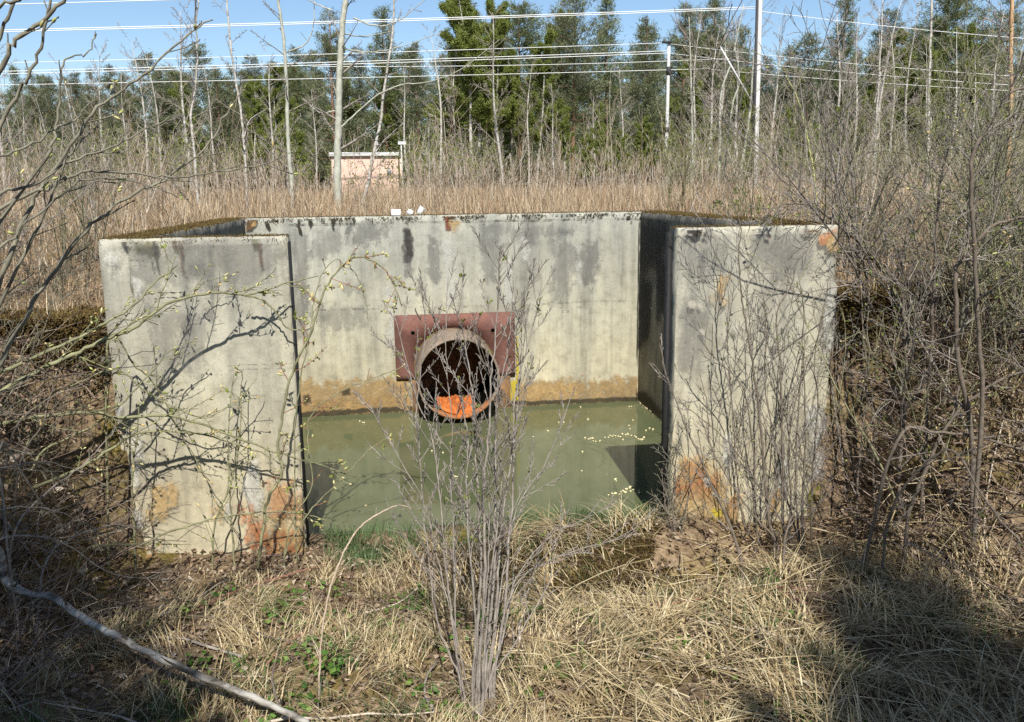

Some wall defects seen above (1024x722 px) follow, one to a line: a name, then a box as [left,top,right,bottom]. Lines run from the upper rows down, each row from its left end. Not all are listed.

leakage [402,228,414,263]
corrosion [444,216,460,231]
corrosion [804,229,838,252]
leakage [636,218,667,352]
leakage [300,375,413,417]
corrosion [674,450,742,524]
corrosion [238,477,305,555]